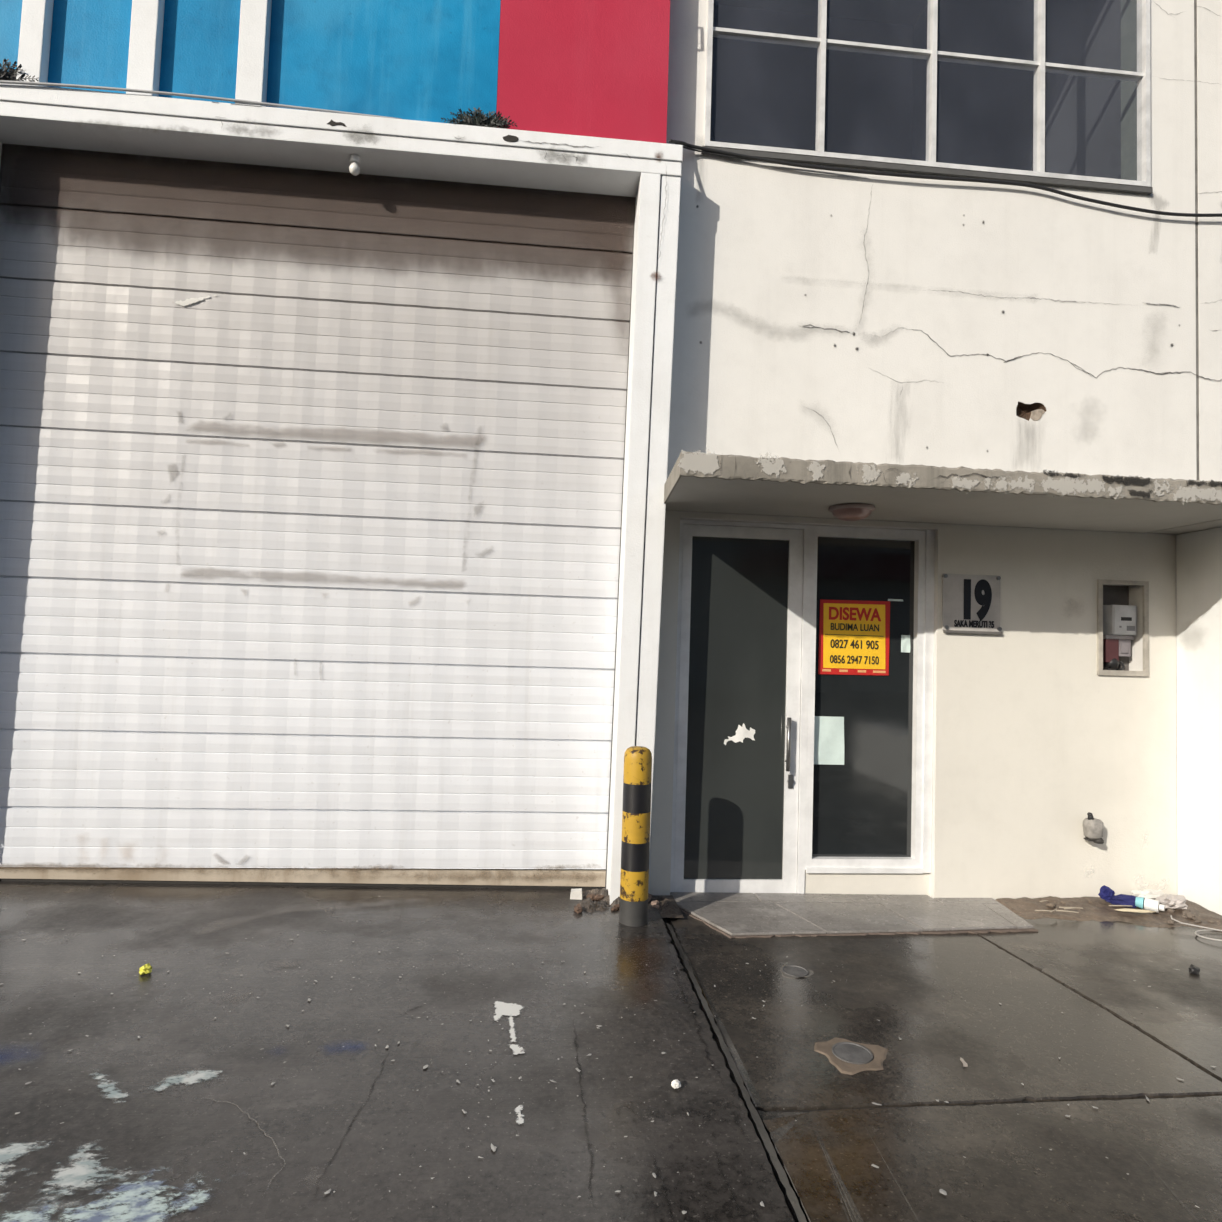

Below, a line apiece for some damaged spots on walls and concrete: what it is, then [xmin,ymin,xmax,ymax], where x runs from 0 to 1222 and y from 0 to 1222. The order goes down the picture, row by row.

crack [912,329,1221,381]
spalling [1016,402,1046,421]
peeling [755,453,787,477]
peeling [807,461,825,481]
peeling [856,463,881,483]
peeling [896,473,918,488]
peeling [951,475,1125,499]
peeling [1153,479,1222,503]